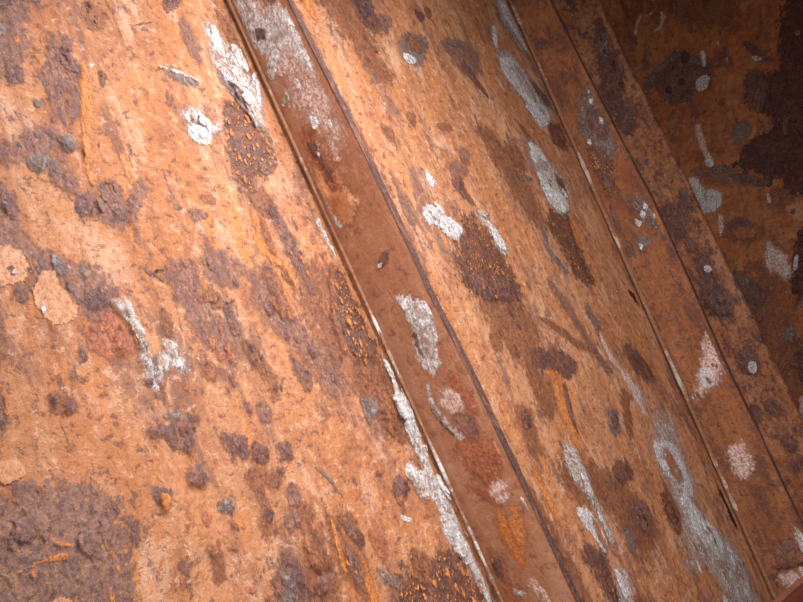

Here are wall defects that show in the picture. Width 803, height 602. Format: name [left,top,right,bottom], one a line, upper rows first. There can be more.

rust [0,181,142,363]
rust [0,0,149,245]
rust [0,452,153,602]
water stain [201,21,265,126]
rust [160,98,415,446]
water stain [233,0,347,155]
water stain [316,218,335,257]
water stain [382,353,492,602]
rust [287,0,660,602]
rust [537,0,803,527]
water stain [613,360,760,602]
water stain [692,332,725,399]